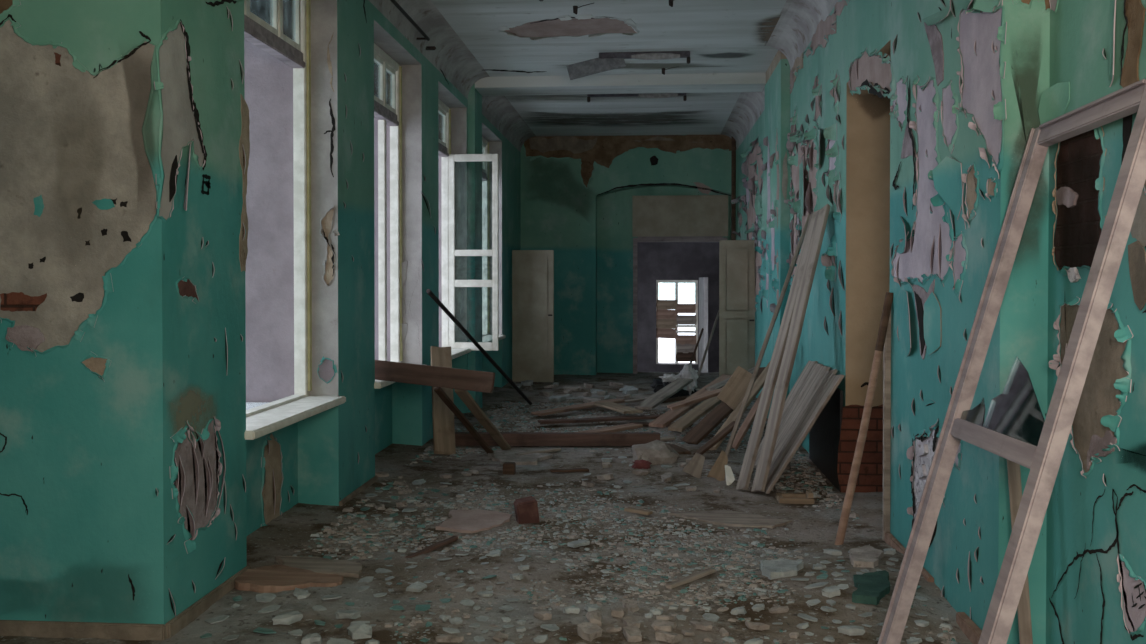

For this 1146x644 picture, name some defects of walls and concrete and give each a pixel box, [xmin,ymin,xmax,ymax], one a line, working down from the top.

crack [93,31,151,78]
spalling [497,15,640,40]
spalling [0,0,207,382]
crack [324,98,336,177]
spalling [523,0,1059,396]
spalling [1052,126,1107,282]
spalling [1070,302,1133,486]
crack [0,493,28,515]
spalling [155,417,238,554]
peeling [791,548,902,644]
spalling [837,404,941,526]
crack [1049,484,1146,644]